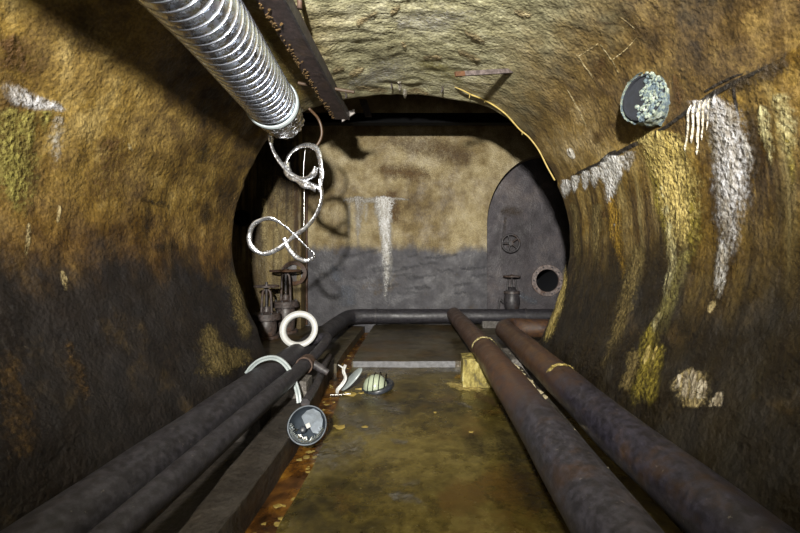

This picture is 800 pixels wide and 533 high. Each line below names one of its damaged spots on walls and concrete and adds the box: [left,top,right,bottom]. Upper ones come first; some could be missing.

leakage [0,87,63,209]
leakage [345,196,405,291]
leakage [561,151,643,361]
leakage [620,71,700,285]
crack [571,64,771,177]
leakage [692,96,751,293]
leakage [620,312,663,401]